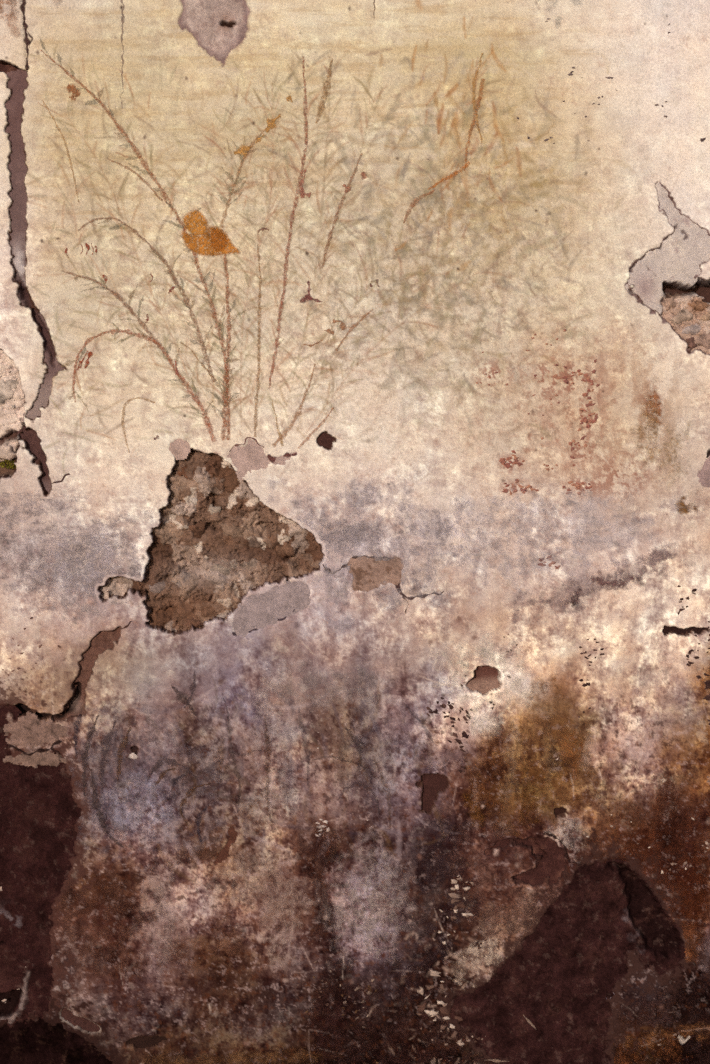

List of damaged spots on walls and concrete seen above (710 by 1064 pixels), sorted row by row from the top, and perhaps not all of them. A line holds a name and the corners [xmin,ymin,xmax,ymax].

crack [118,0,126,104]
spalling [178,0,250,66]
crack [0,0,70,494]
spalling [625,182,710,354]
spalling [0,349,25,477]
spalling [697,450,710,487]
spalling [100,437,323,637]
spalling [348,556,404,592]
spalling [466,666,500,695]
spalling [416,773,449,813]
spalling [0,704,113,1064]
spalling [450,837,685,1064]